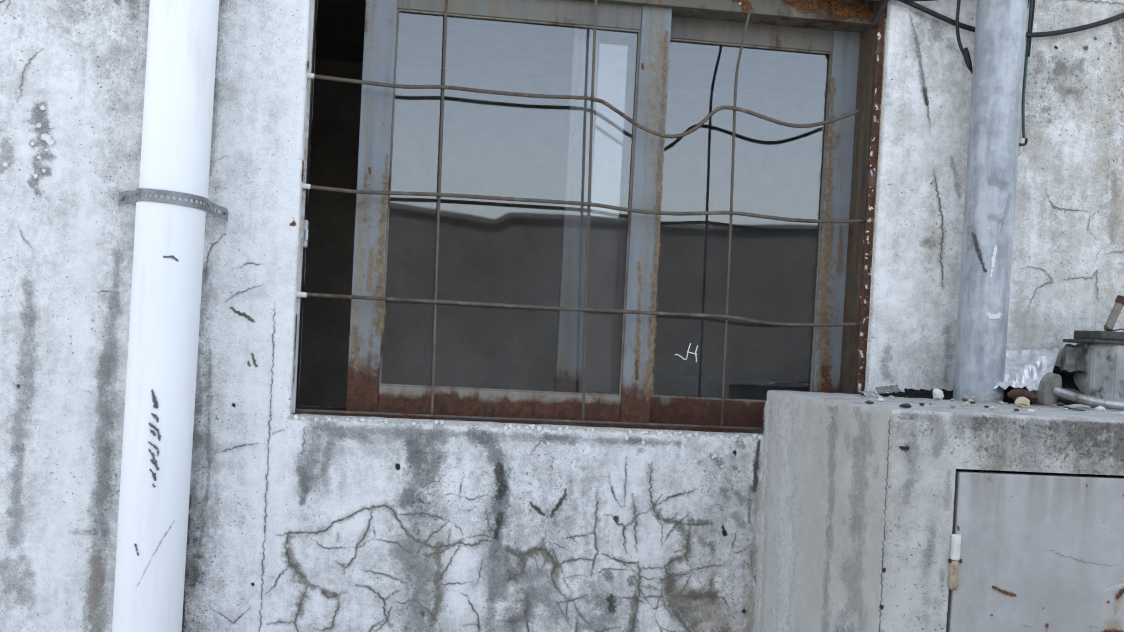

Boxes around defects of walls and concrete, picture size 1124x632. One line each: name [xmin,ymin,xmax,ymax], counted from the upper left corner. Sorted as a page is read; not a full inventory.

crack [910,16,931,124]
crack [934,173,944,290]
crack [1021,189,1124,308]
damp [398,428,446,509]
crack [213,262,756,632]